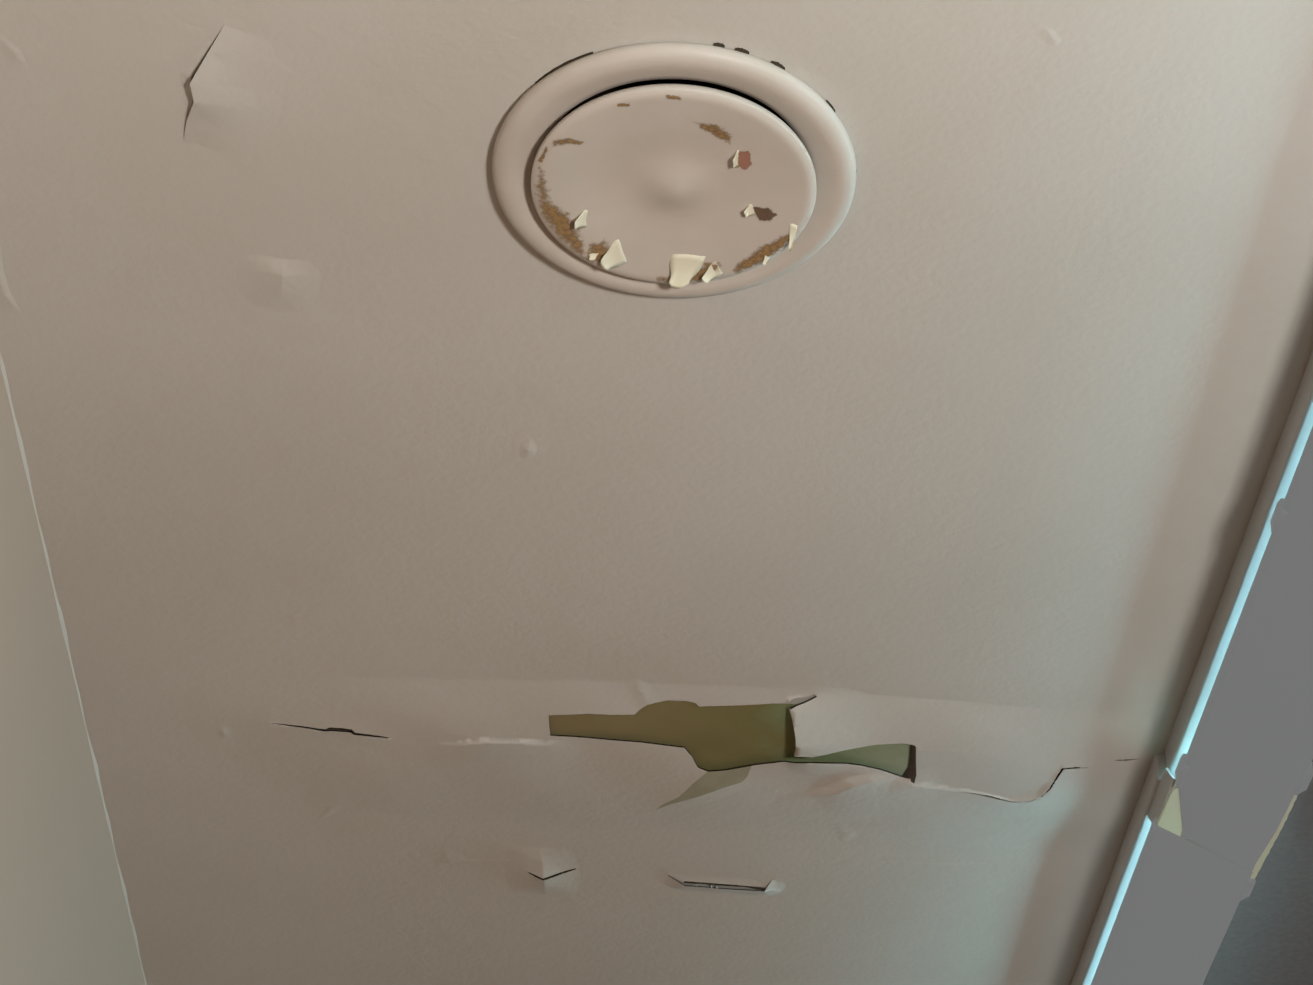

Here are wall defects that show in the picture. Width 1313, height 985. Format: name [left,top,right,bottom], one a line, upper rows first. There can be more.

rust [700,124,730,140]
peeling [733,150,751,170]
rust [537,138,608,263]
peeling [575,210,588,230]
peeling [744,204,777,221]
peeling [588,239,627,270]
rust [736,235,789,272]
peeling [669,254,723,289]
rust [691,263,718,281]
crack [276,723,389,738]
peeling [549,693,916,810]
crack [972,767,1080,802]